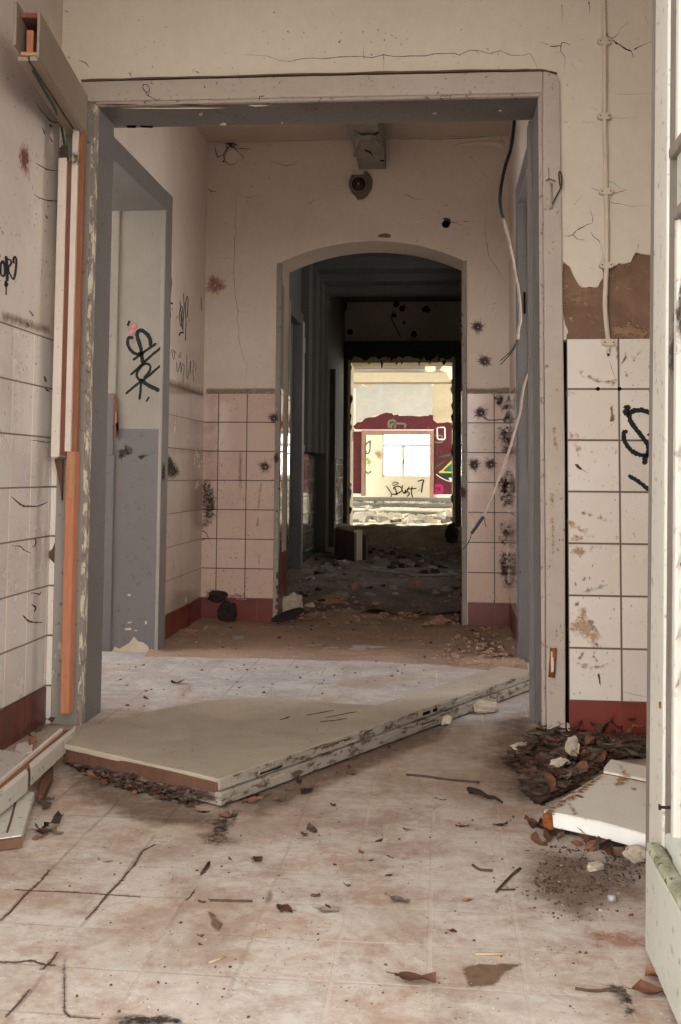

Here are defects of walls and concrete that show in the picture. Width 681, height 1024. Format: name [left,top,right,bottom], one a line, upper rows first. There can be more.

crack [245,42,576,74]
crack [607,16,650,58]
crack [570,181,642,243]
spalling [563,243,650,340]
peeling [112,621,149,652]
crack [0,844,156,920]
crack [0,952,100,1019]